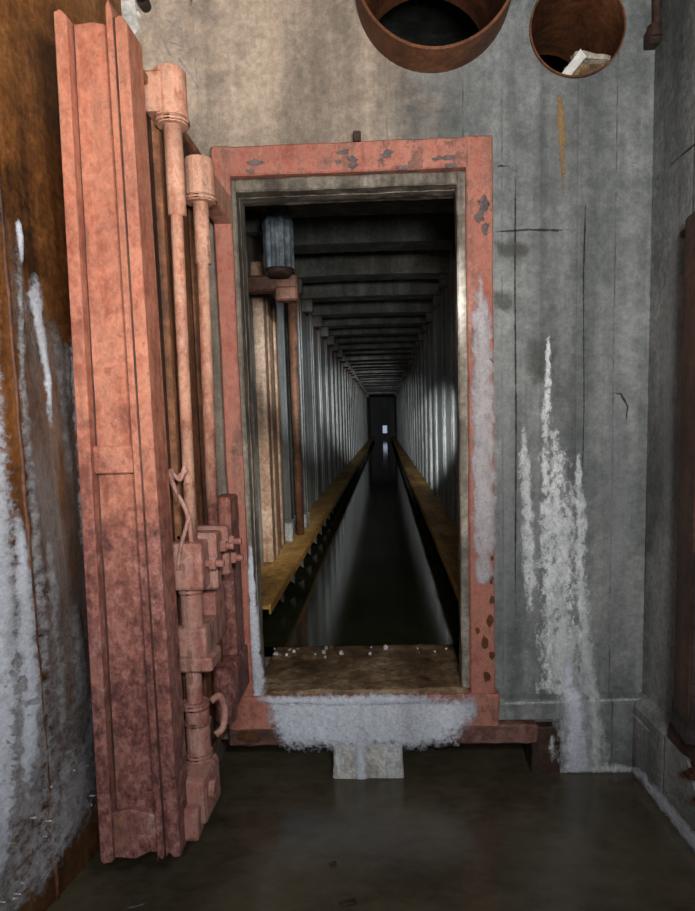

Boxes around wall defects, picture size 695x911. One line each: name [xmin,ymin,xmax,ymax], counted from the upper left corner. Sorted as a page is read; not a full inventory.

peeling [474,194,490,235]
peeling [471,279,497,584]
leakage [0,220,97,911]
rust [113,806,157,859]
leakage [248,547,477,780]
peeling [475,615,495,660]
leakage [517,336,633,773]
spalling [678,761,695,781]